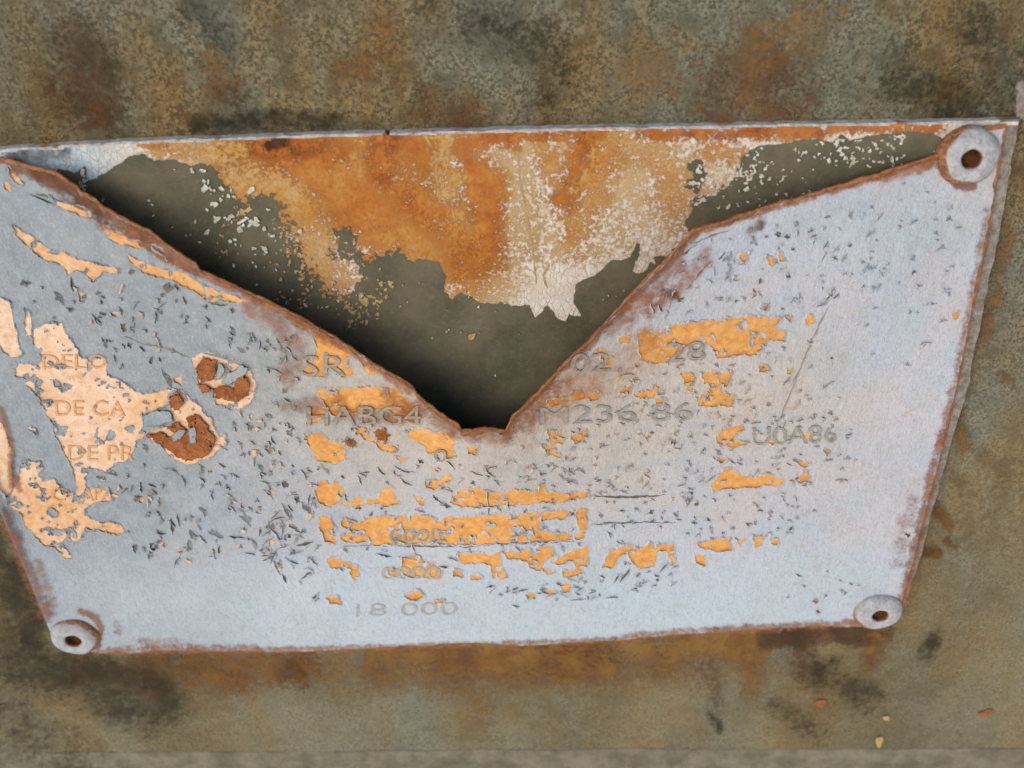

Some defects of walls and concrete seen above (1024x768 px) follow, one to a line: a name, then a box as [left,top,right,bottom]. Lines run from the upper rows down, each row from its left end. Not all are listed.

spalling [264,138,290,151]
peeling [684,131,942,232]
peeling [933,204,962,252]
rust [7,124,977,449]
rust [142,349,259,467]
peeling [0,154,890,610]
rust [60,609,893,698]